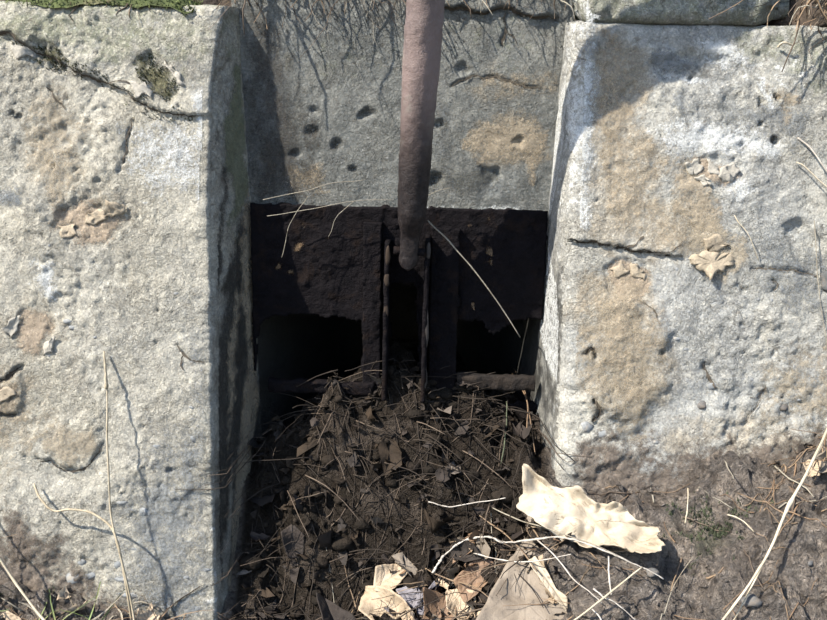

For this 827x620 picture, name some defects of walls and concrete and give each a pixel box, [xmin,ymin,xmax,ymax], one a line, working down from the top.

crack [444,6,557,46]
crack [0,31,201,160]
damp [243,17,317,203]
crack [568,236,683,257]
crack [751,267,819,290]
damp [217,167,259,584]